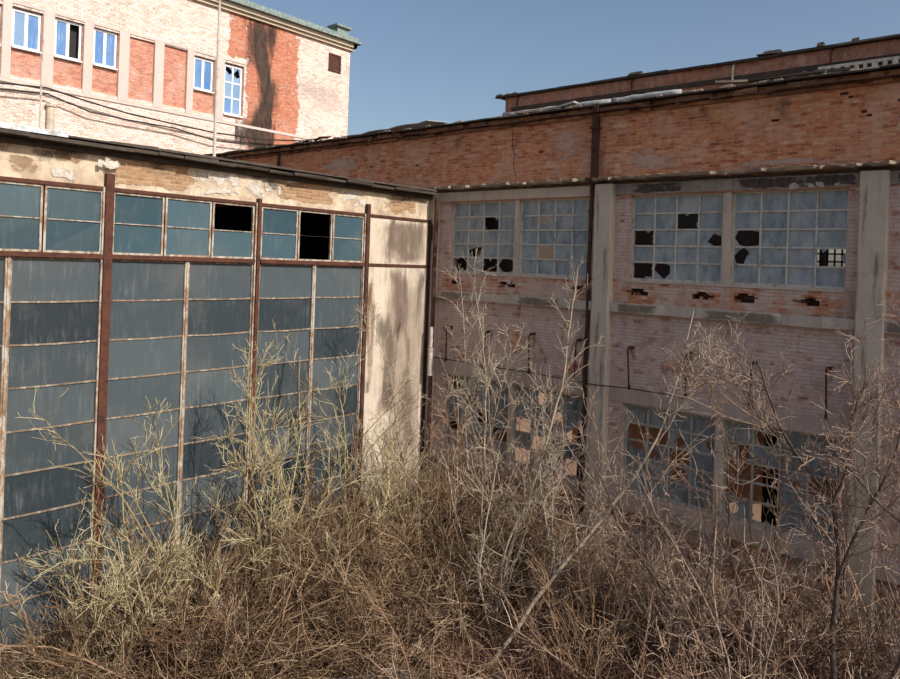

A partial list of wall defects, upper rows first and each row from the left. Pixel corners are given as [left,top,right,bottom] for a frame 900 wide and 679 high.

peeling [0,142,87,181]
spalling [98,157,368,207]
damp [389,221,422,261]
spalling [626,288,649,296]
spalling [692,291,716,300]
spalling [734,293,758,303]
spalling [793,297,821,306]
damp [371,274,424,407]
damp [402,342,413,443]